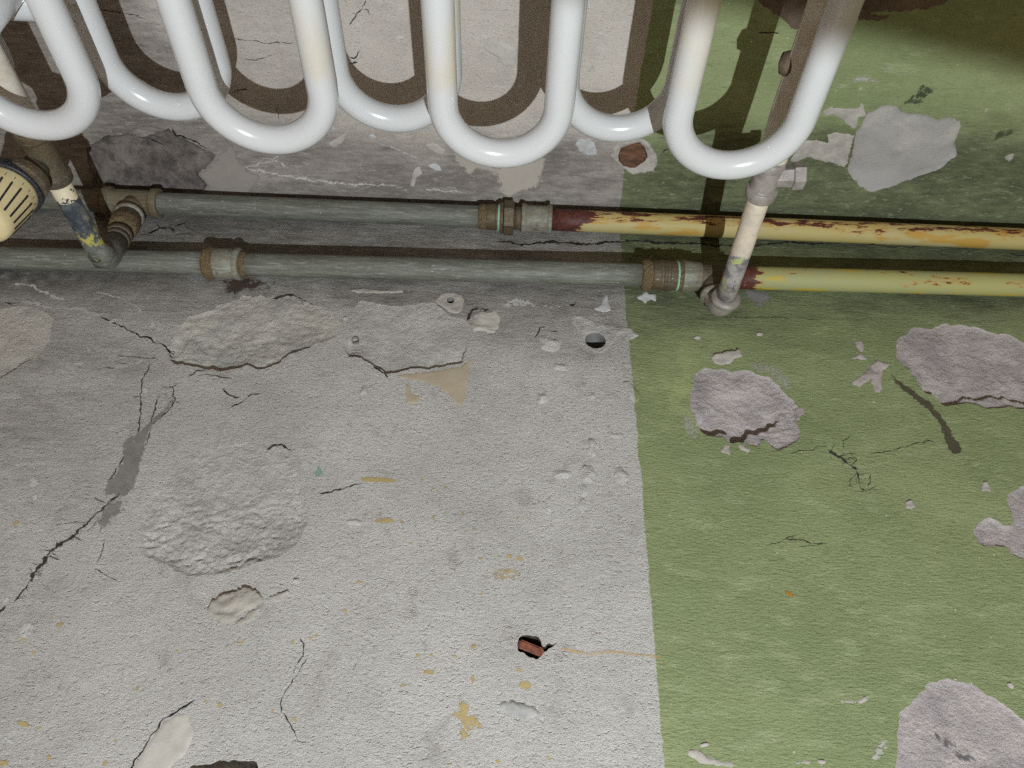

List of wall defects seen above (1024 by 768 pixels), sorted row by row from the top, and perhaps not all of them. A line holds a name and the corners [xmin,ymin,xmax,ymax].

flaking render [791,103,961,192]
crack [100,316,260,445]
flaking render [680,349,805,455]
flaking render [852,323,1024,409]
crack [0,457,124,612]
flaking render [973,486,1024,559]
crack [280,639,308,744]
hole [518,635,557,659]
flaking render [895,679,1024,768]